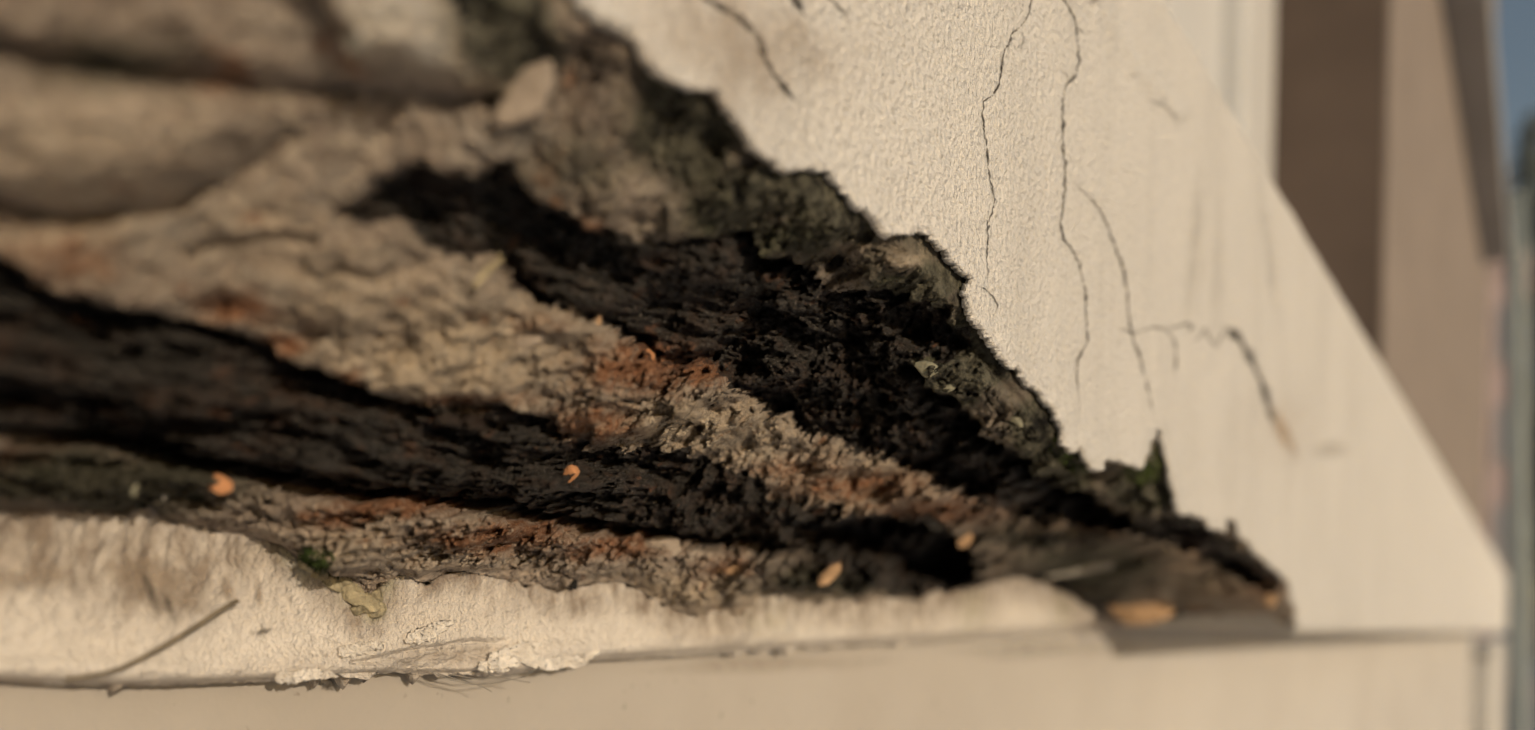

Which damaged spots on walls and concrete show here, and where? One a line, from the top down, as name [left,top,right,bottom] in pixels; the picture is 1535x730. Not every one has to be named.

crack [792,0,845,15]
crack [706,0,792,97]
crack [981,0,1274,421]
spalling [0,0,1294,625]
damp [296,559,387,618]
peeling [275,640,385,685]
peeling [404,620,457,649]
peeling [477,639,601,673]